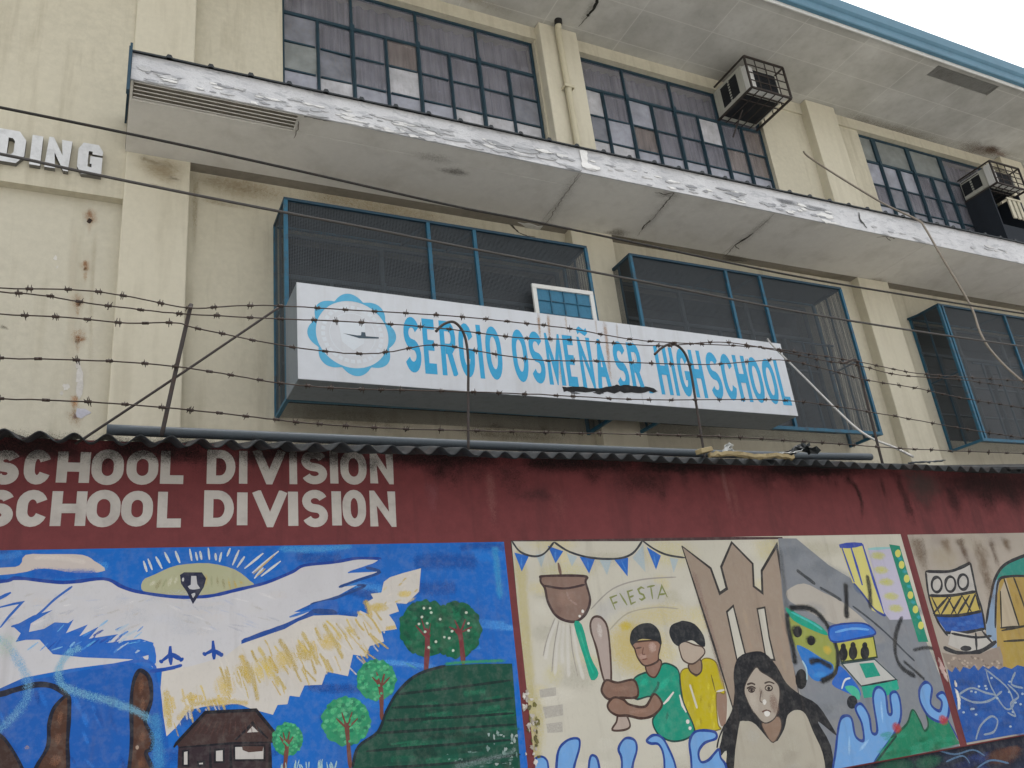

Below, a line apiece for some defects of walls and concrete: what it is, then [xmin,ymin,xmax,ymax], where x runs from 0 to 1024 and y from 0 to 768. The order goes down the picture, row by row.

crack [578,0,600,27]
peeling [138,66,181,86]
peeling [195,82,747,203]
crack [510,168,584,237]
crack [637,191,679,236]
peeling [759,198,841,225]
crack [722,213,777,262]